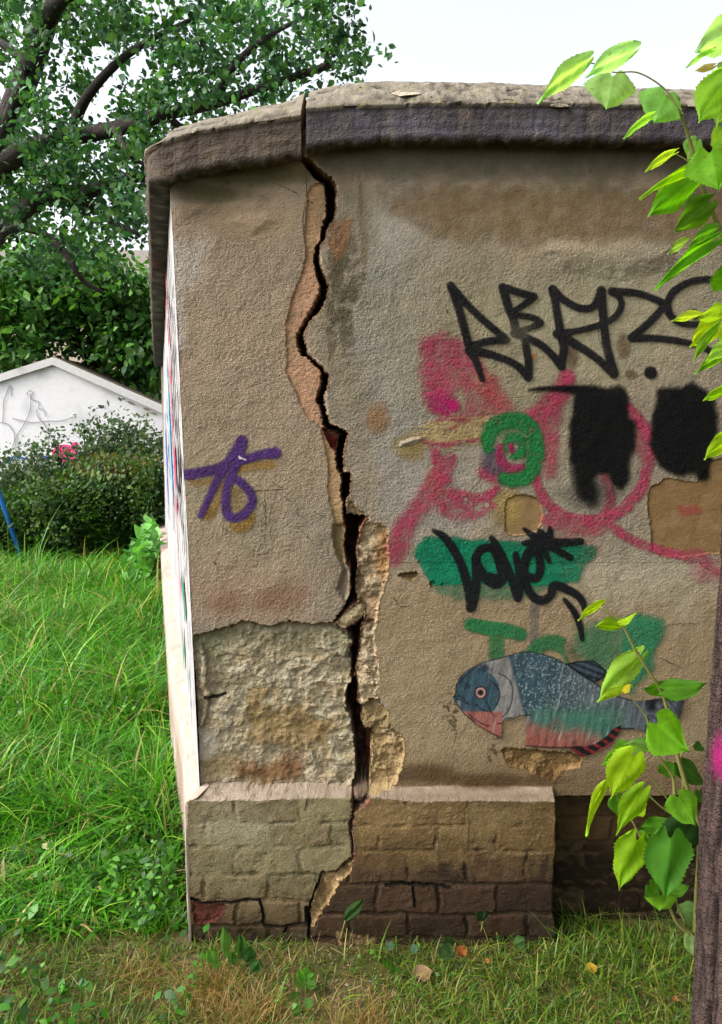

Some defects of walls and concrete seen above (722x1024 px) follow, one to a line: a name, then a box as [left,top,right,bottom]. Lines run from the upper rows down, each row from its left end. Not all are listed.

crack [190,157,373,942]
flaking render [192,182,434,795]
flaking render [310,858,352,927]
flaking render [501,746,584,783]